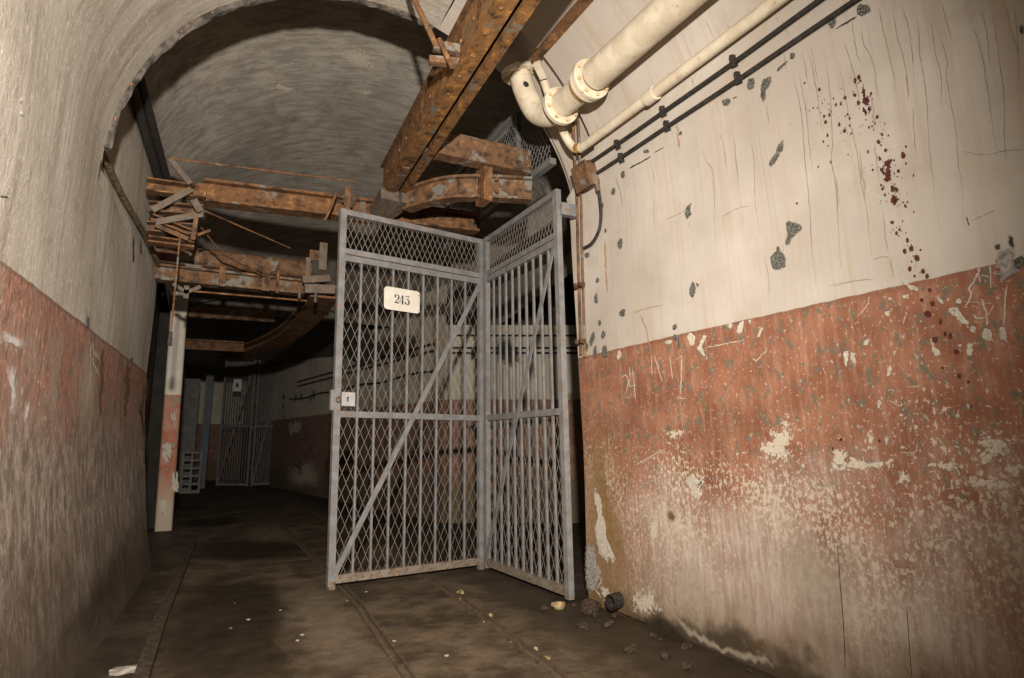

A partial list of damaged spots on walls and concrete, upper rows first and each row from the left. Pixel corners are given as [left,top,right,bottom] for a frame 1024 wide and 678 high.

spalling [769,140,784,166]
spalling [770,221,802,270]
peeling [937,236,1024,356]
peeling [158,442,179,517]
peeling [686,473,705,500]
peeling [832,430,918,471]
peeling [928,461,958,472]
peeling [594,488,615,562]
water stain [649,509,674,546]
water stain [614,585,767,662]